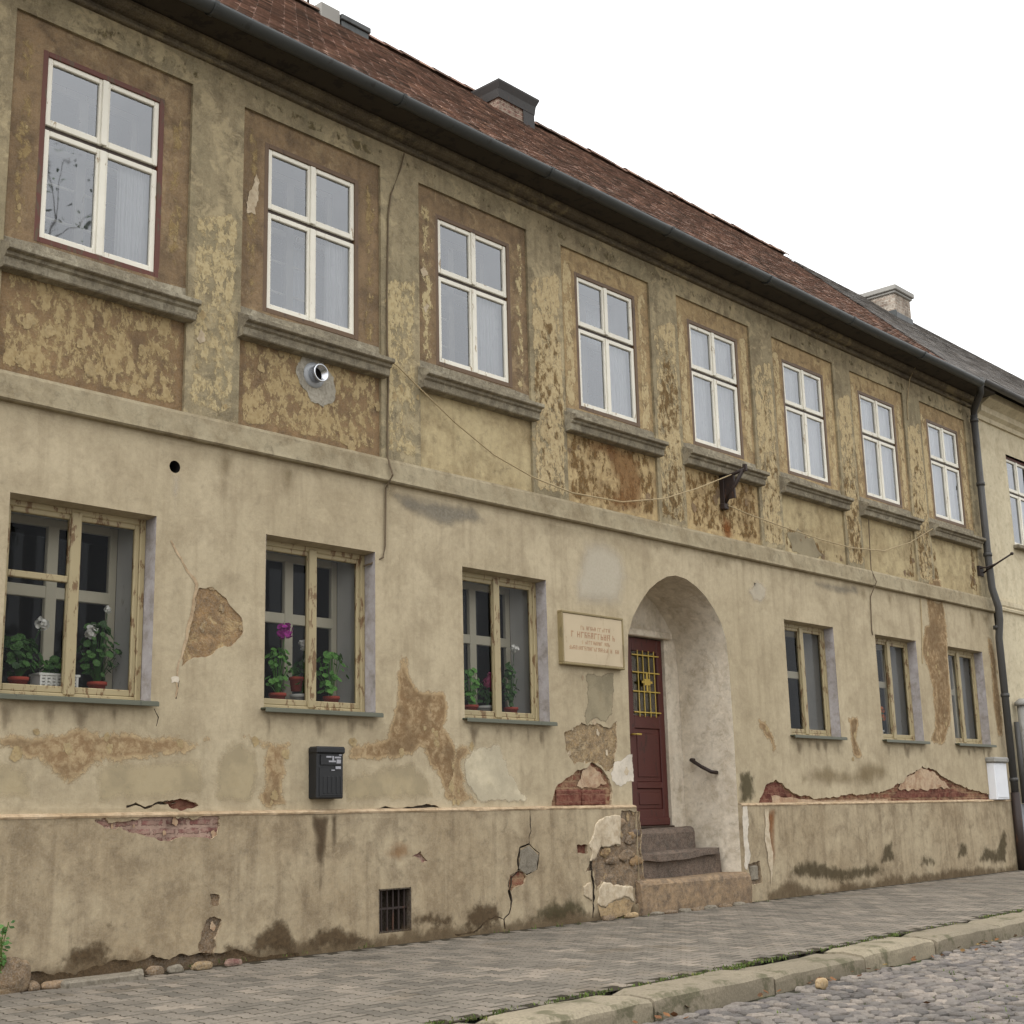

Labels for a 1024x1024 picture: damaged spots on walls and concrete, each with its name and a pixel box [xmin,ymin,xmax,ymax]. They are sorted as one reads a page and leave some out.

peeling [190,130,433,456]
peeling [512,244,865,565]
spalling [182,587,243,666]
peeling [349,657,477,806]
spalling [95,798,220,841]
crack [474,816,539,933]
spalling [552,719,645,918]
spalling [759,766,989,803]
damp [764,808,1016,900]
damp [39,943,145,982]
spalling [105,894,245,974]
damp [225,902,603,963]